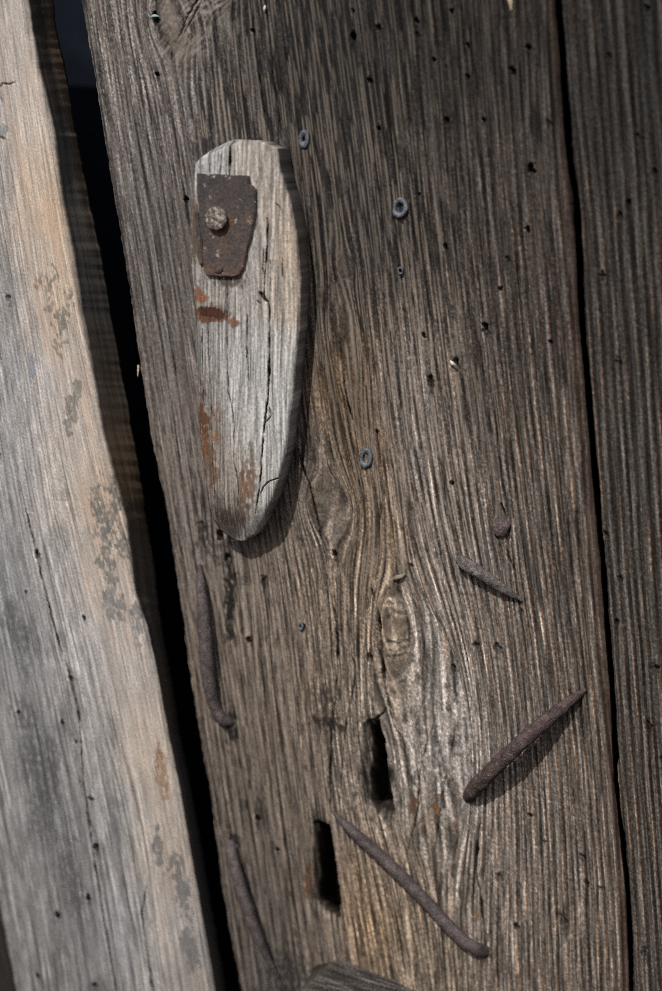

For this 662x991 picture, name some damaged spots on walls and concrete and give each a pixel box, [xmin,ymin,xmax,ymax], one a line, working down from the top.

corrosion [190,202,233,260]
corrosion [194,287,239,327]
crack [201,225,276,499]
corrosion [199,381,220,486]
corrosion [236,470,255,522]
crack [298,450,327,564]